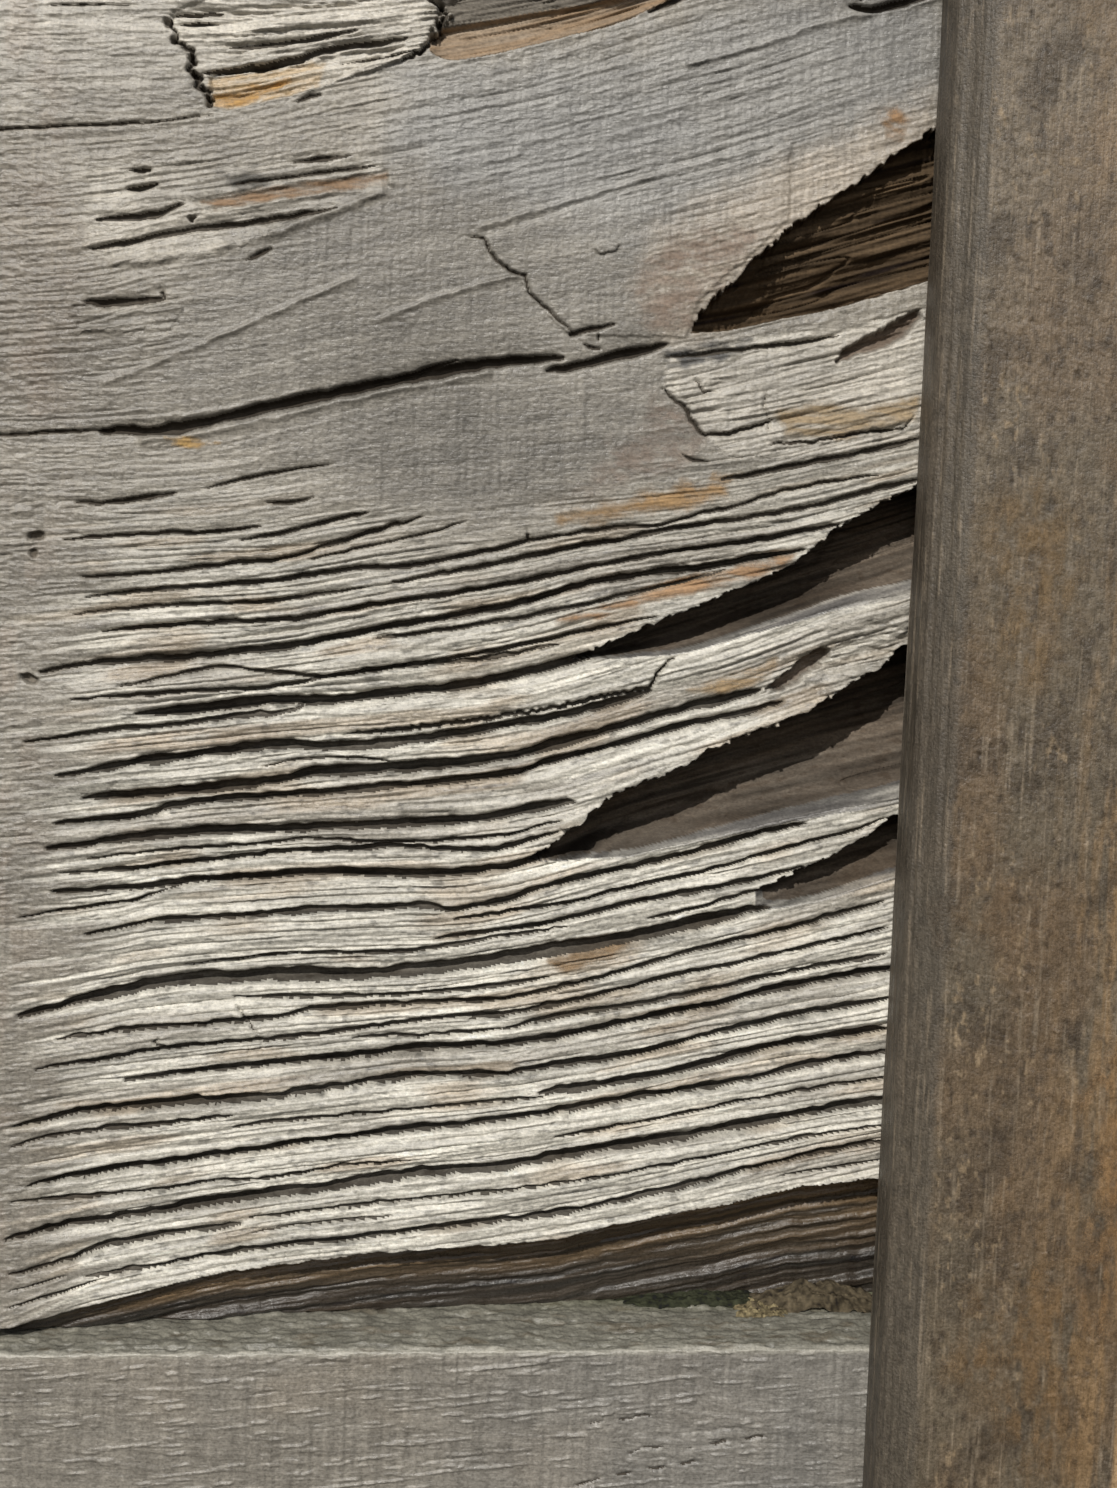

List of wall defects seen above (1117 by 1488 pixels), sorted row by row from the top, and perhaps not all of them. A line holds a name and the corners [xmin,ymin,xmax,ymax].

crack [648,0,681,13]
crack [849,0,924,13]
crack [0,235,919,1309]